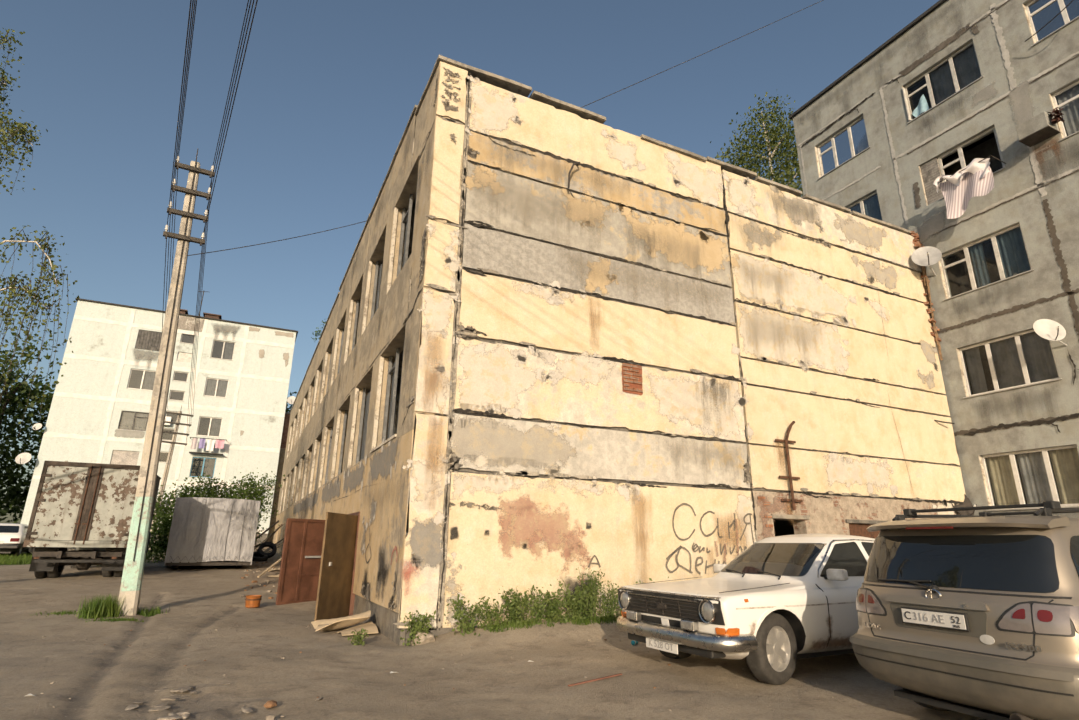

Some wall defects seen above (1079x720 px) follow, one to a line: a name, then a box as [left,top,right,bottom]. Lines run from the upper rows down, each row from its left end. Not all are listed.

peeling [433,68,523,195]
peeling [561,151,897,375]
crack [316,78,964,630]
crack [1067,349,1079,385]
peeling [293,224,754,627]
crack [964,413,1079,436]
peeling [824,451,898,496]
peeling [933,499,954,515]
damp [500,513,514,557]